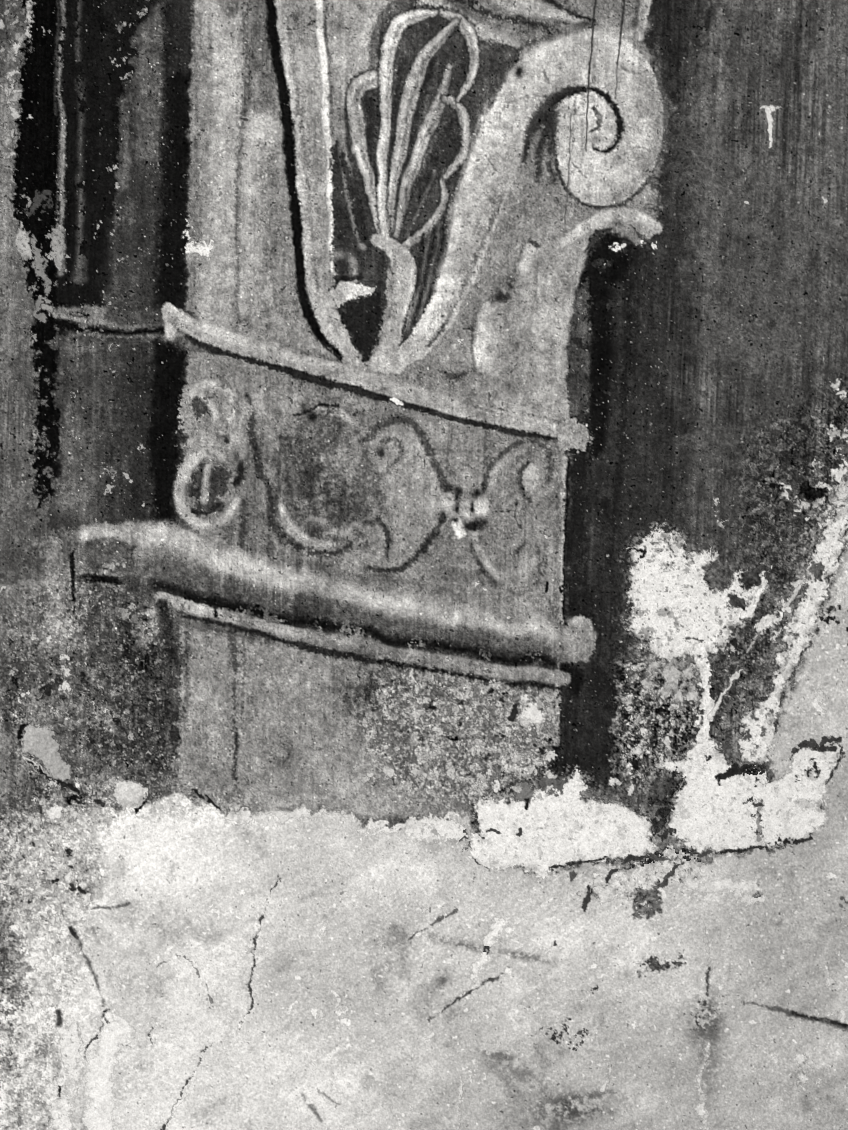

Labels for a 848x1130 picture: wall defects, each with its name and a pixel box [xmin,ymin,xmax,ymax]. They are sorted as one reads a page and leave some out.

peeling [0,0,50,183]
peeling [0,190,71,355]
spalling [183,219,214,260]
spalling [829,378,848,400]
flaking render [0,421,848,1130]
crack [239,881,278,1030]
crack [161,1046,208,1130]